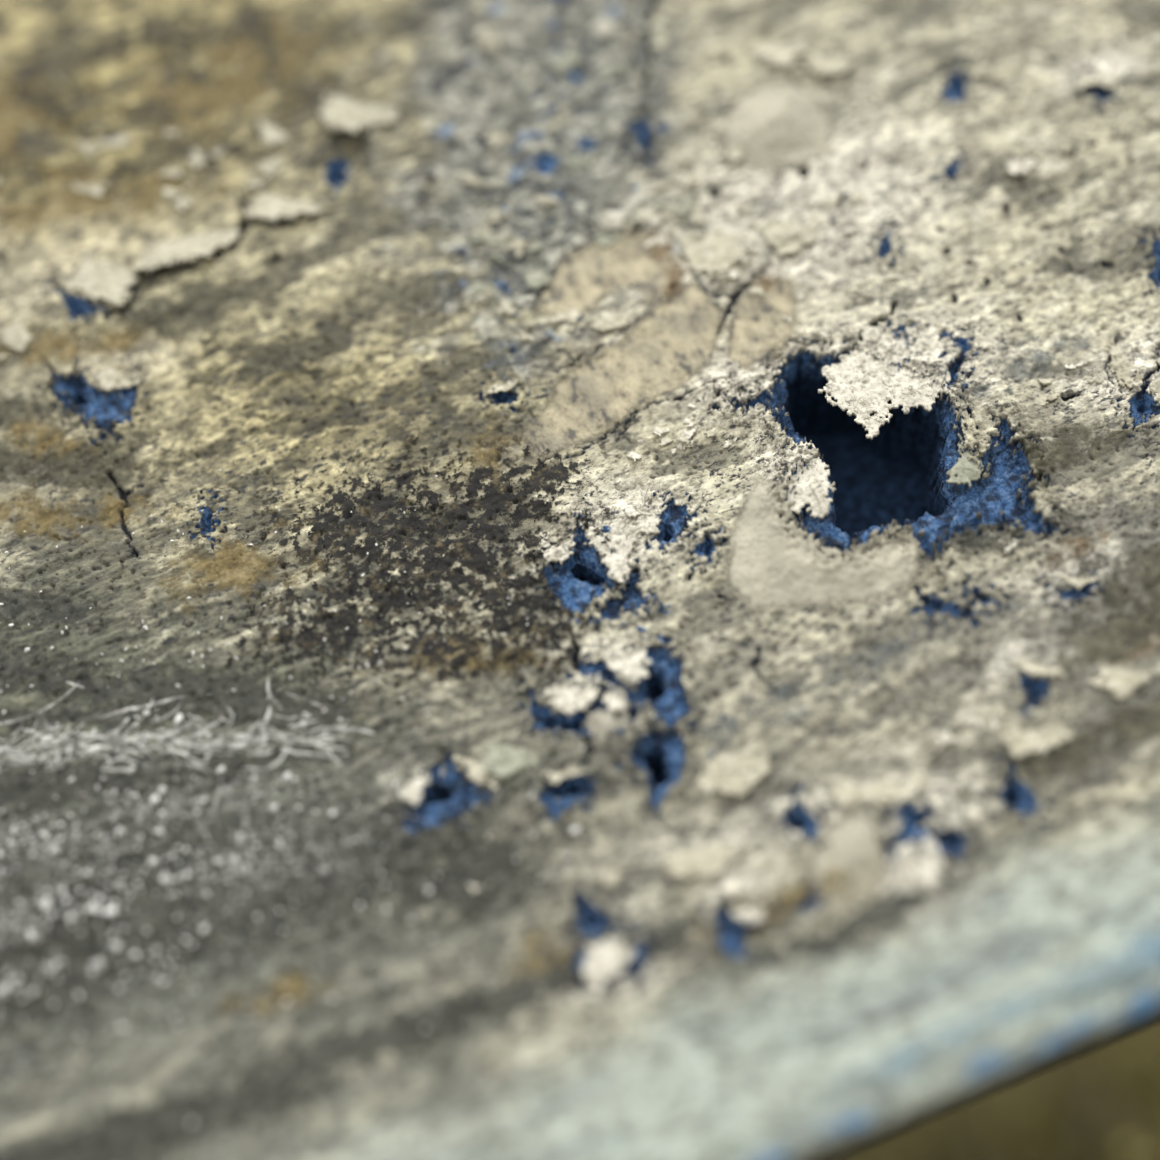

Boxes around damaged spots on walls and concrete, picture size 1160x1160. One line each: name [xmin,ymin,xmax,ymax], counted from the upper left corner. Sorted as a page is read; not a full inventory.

peeling [41,94,399,333]
crack [532,211,648,311]
crack [556,297,661,373]
crack [693,272,764,335]
hole [38,359,150,455]
crack [542,373,736,464]
spalling [451,156,1069,634]
peeling [1037,342,1160,439]
crack [107,473,143,557]
spalling [187,489,228,550]
spalling [392,490,771,848]
spalling [554,865,668,1002]